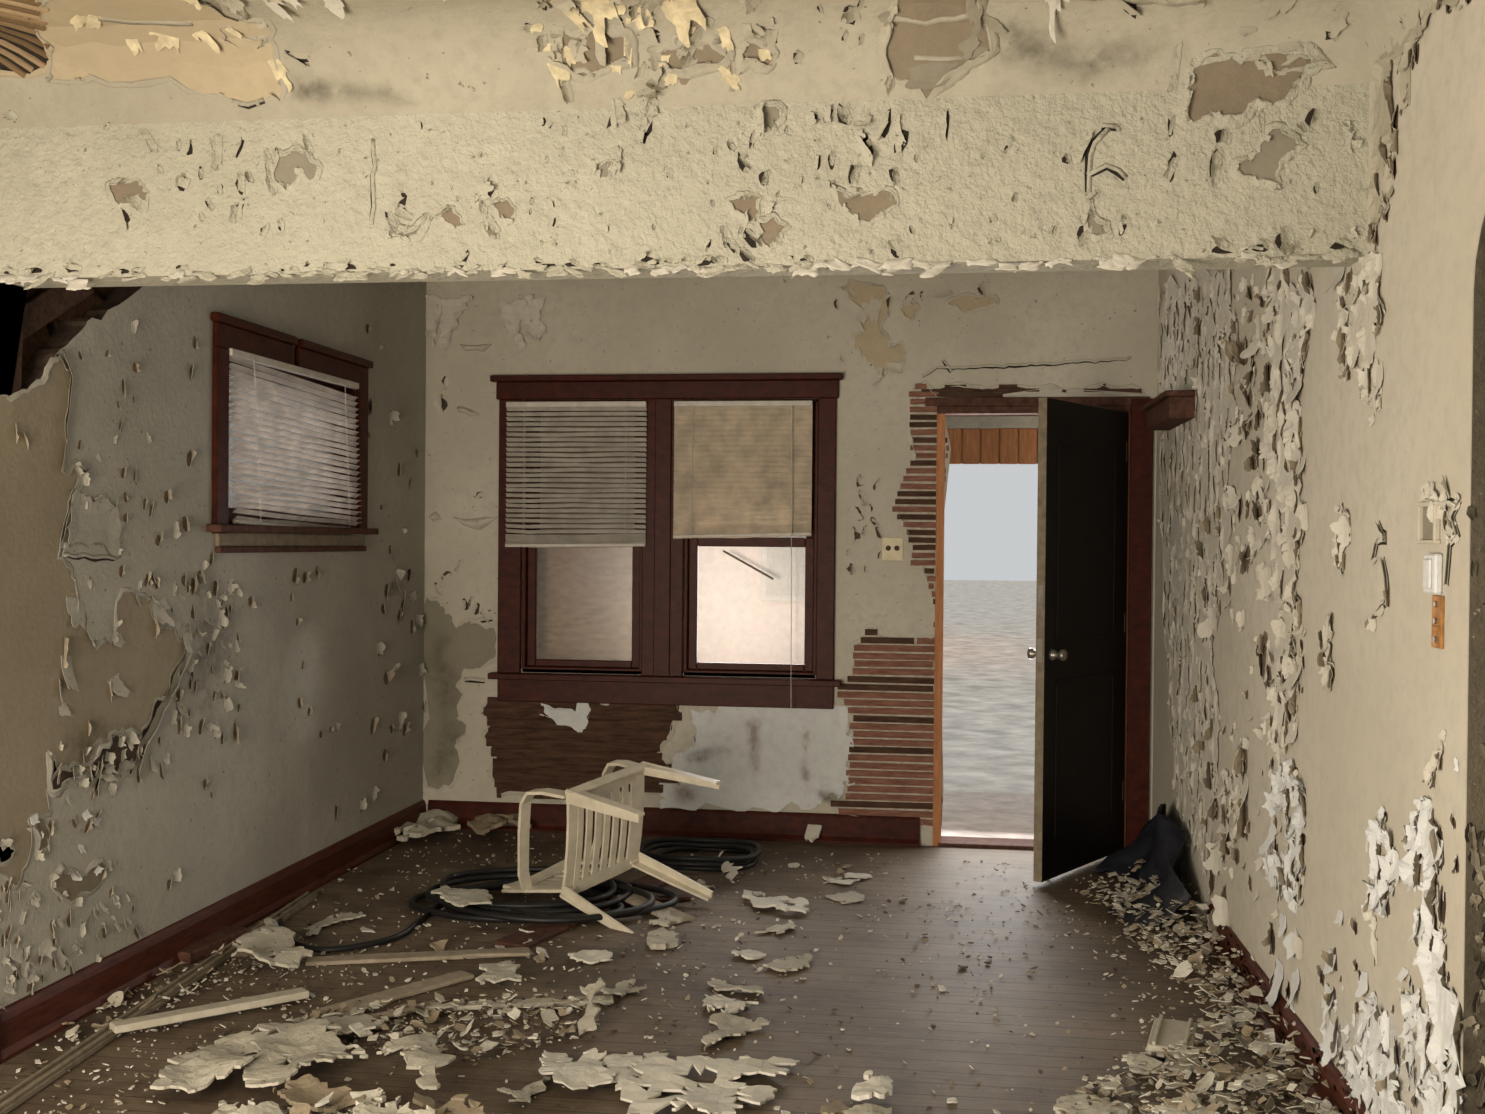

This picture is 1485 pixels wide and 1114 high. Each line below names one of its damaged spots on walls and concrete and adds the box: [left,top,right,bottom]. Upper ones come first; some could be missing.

peeling [0,0,1073,1011]
peeling [368,0,1485,1114]